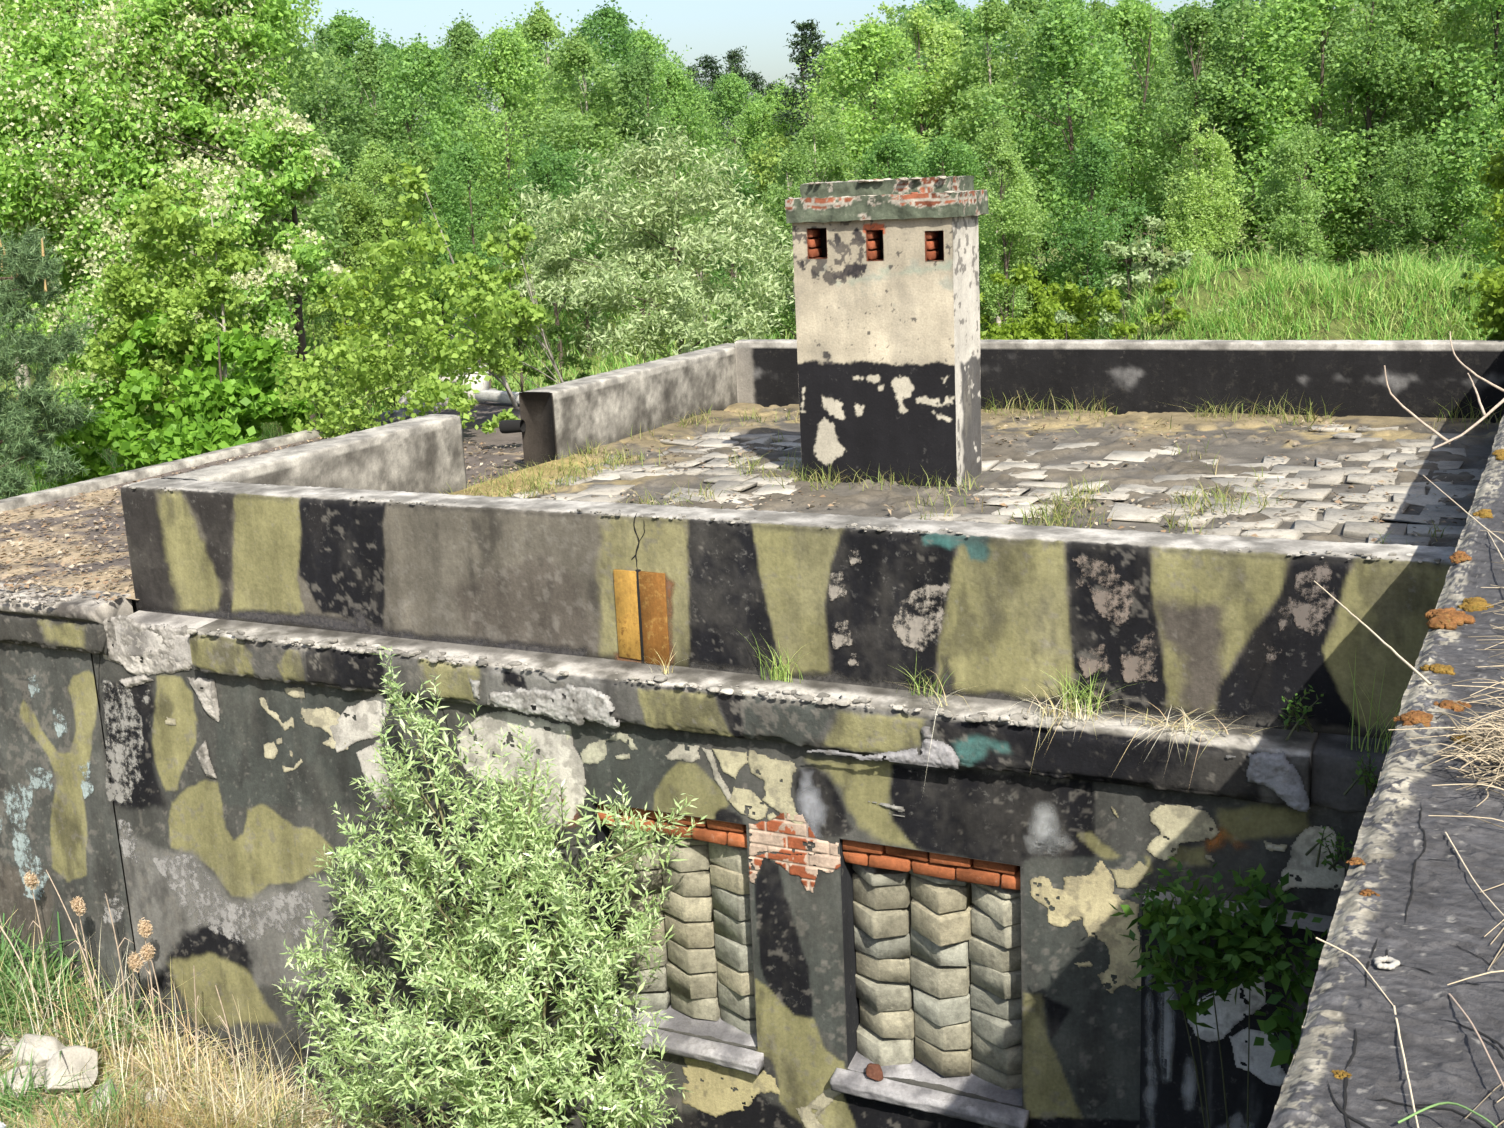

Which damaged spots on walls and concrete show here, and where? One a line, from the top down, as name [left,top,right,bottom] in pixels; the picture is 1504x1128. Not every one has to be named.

peeling [828,554,861,601]
peeling [892,583,950,652]
peeling [53,710,67,737]
peeling [79,615,1077,943]
peeling [0,767,53,900]
peeling [1030,804,1220,993]
crack [1365,802,1503,991]
crack [1327,1028,1489,1128]
crack [1438,1019,1504,1059]